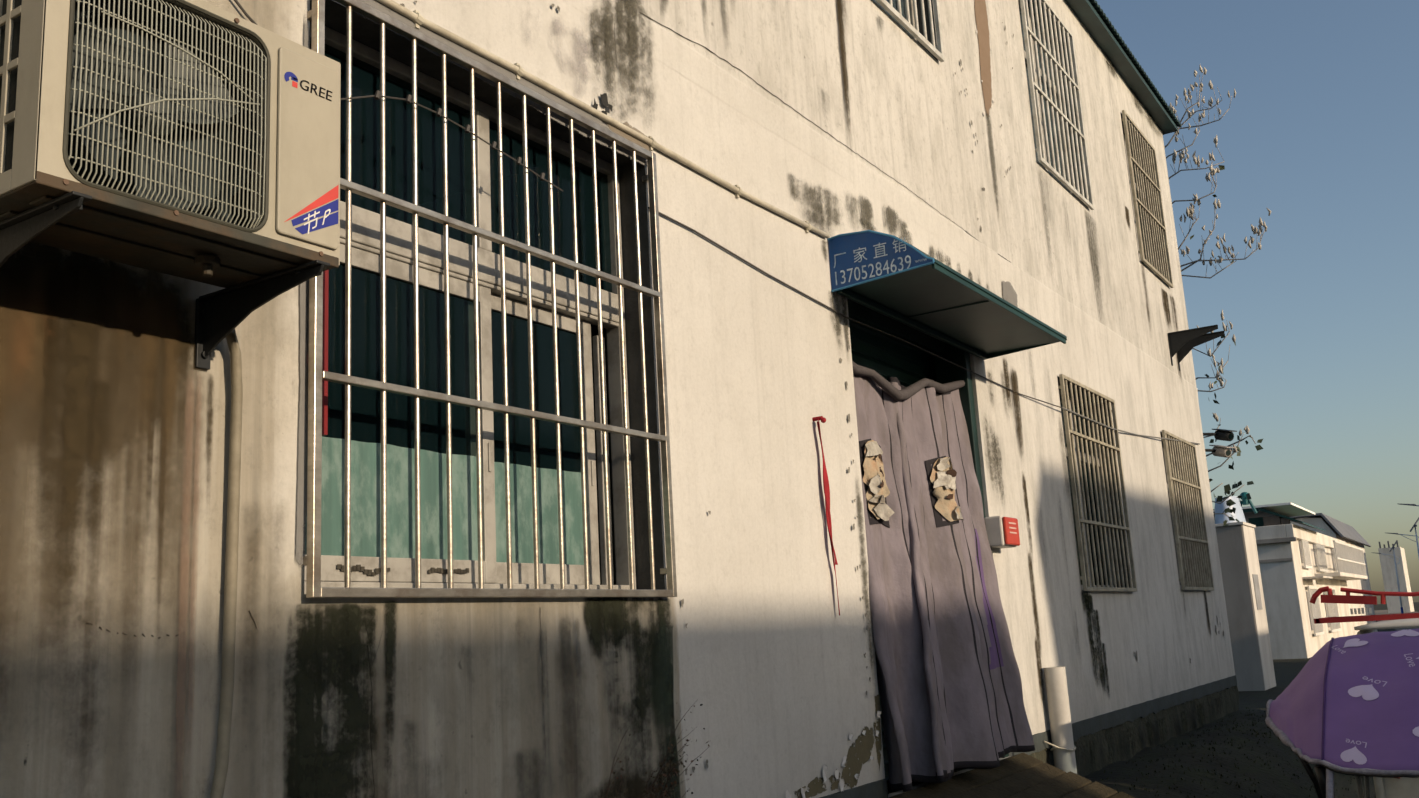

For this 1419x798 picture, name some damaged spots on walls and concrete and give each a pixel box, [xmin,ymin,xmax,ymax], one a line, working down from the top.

leakage [555,0,653,115]
leakage [791,175,912,258]
leakage [832,294,849,352]
leakage [0,241,213,637]
leakage [986,420,1004,494]
leakage [989,360,1023,453]
leakage [284,601,397,798]
leakage [561,597,681,798]
spalling [786,489,882,798]
leakage [1023,475,1045,700]
leakage [1082,592,1109,692]